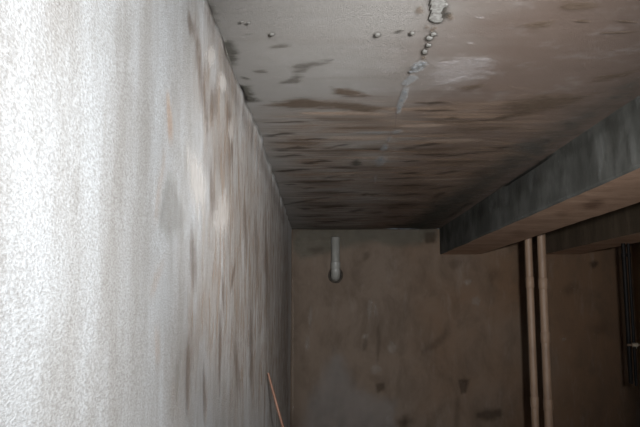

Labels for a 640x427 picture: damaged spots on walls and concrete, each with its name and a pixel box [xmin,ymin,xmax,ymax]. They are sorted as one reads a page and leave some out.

spalling [429,0,452,23]
water stain [224,40,238,61]
water stain [277,62,586,242]